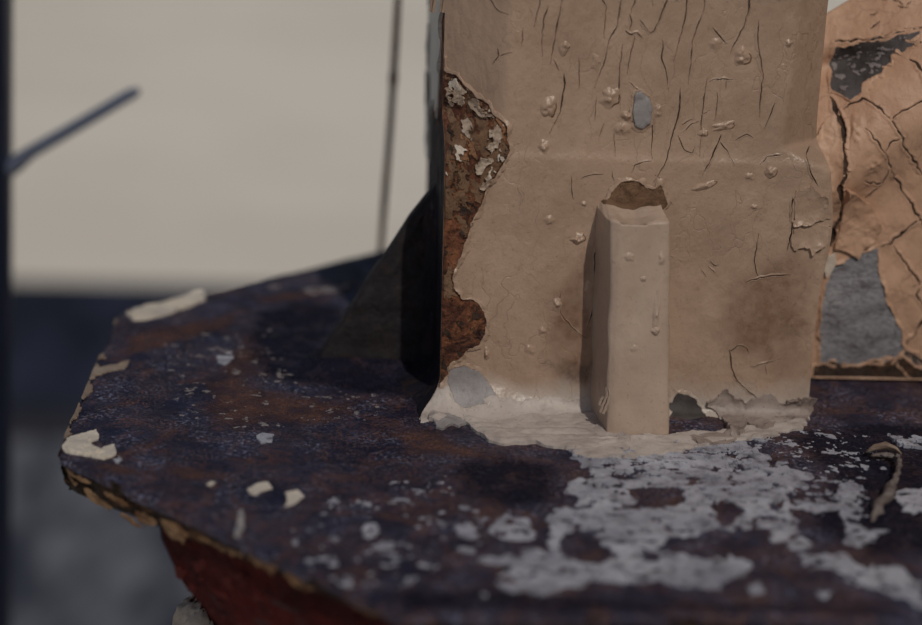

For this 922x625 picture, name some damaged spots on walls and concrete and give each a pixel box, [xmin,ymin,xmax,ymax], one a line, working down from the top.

crack [489,0,922,365]
peeling [113,290,205,325]
peeling [415,16,922,609]
peeling [62,353,130,464]
peeling [389,476,454,516]
peeling [291,497,439,588]
peeling [172,596,213,625]